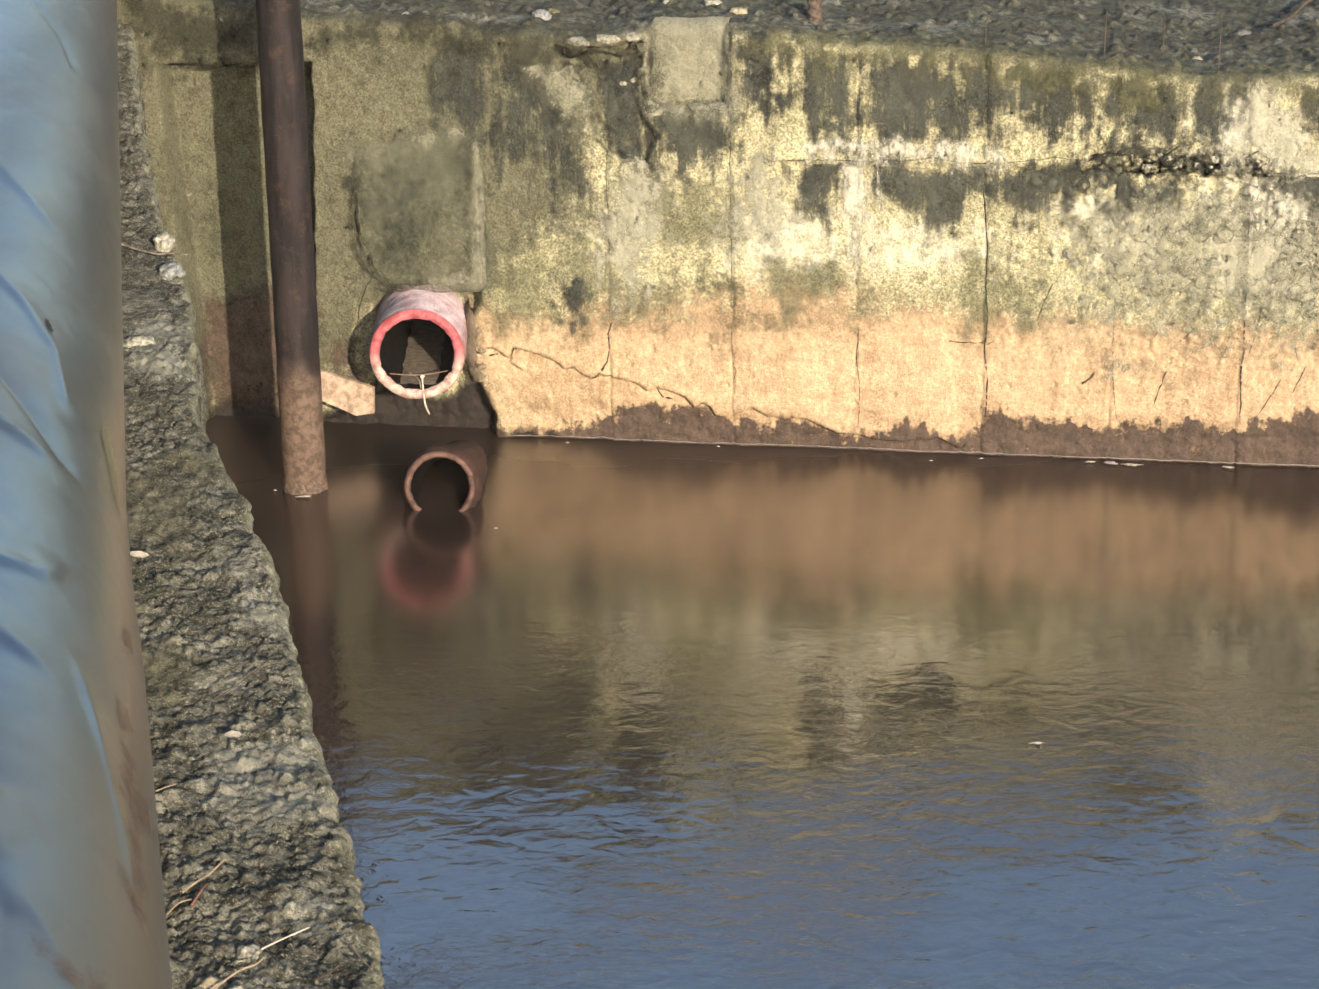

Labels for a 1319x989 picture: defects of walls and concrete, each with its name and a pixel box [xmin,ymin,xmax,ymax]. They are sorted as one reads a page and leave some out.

damp [343,28,1319,335]
crack [770,87,1317,434]
corrosion [199,286,279,413]
corrosion [330,341,380,388]
crack [488,322,613,379]
damp [323,380,1319,467]